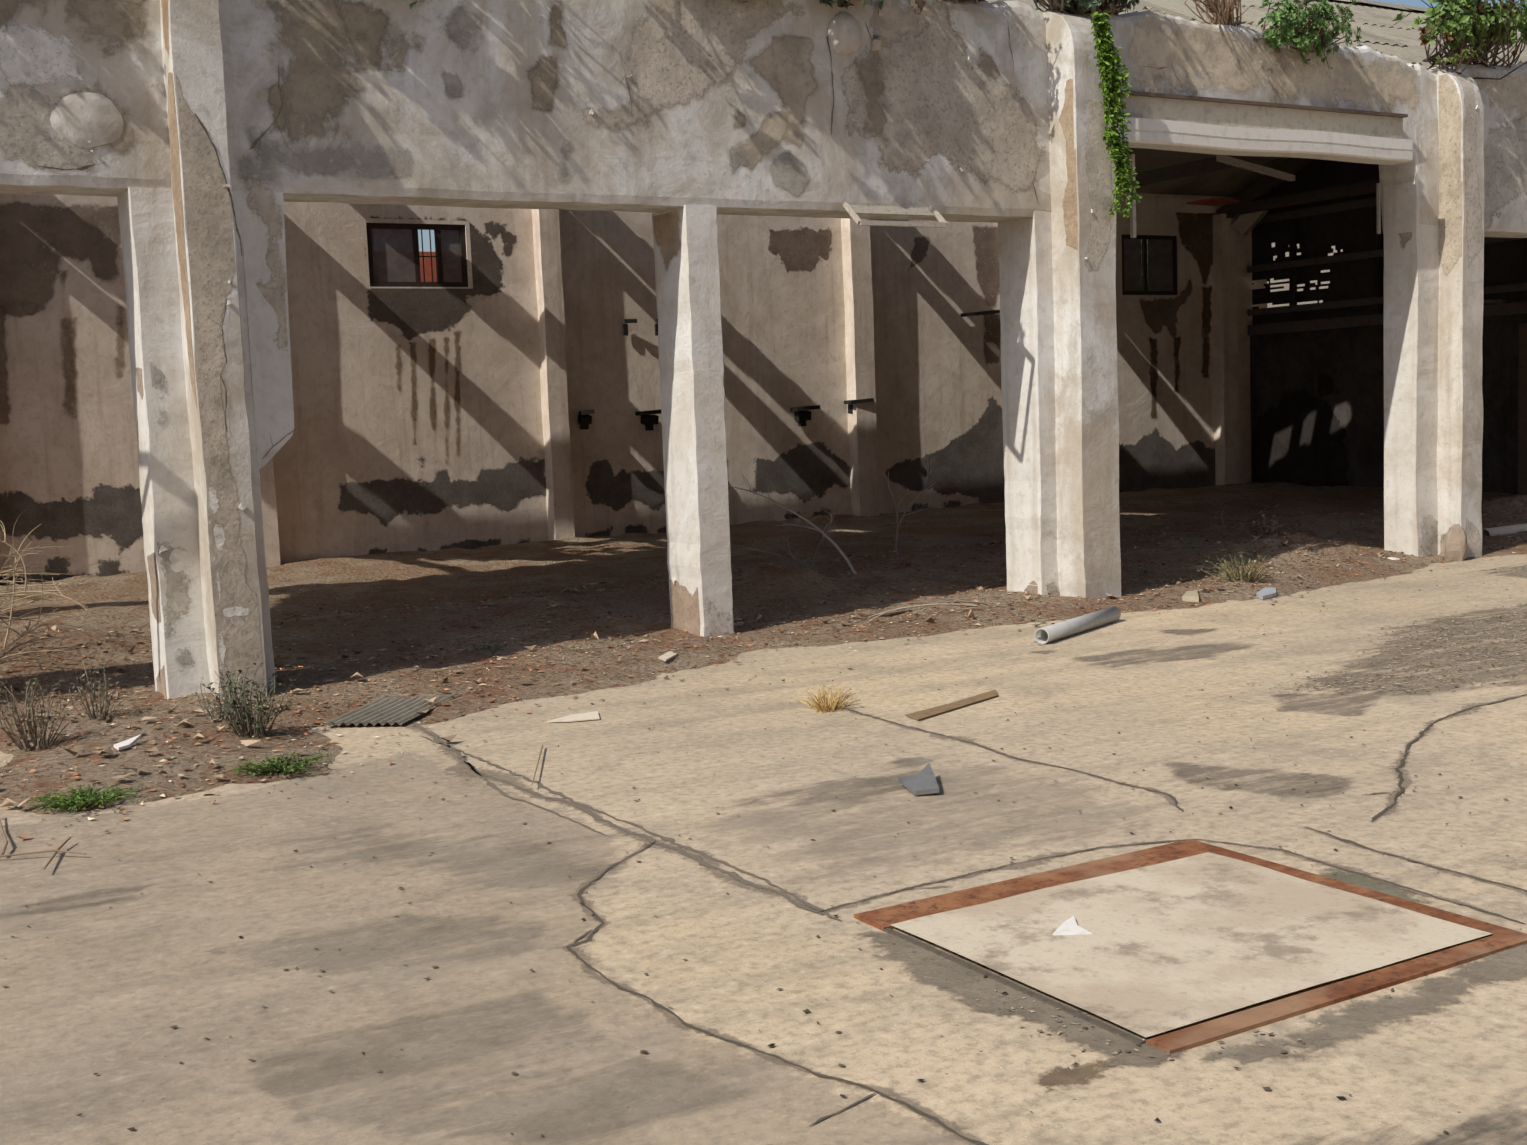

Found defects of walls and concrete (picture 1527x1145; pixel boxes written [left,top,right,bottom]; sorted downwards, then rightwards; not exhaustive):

peeling [0,20,96,172]
peeling [582,0,804,133]
peeling [841,0,1045,192]
peeling [1059,79,1078,250]
water stain [0,202,120,424]
water stain [0,483,191,638]
peeling [168,72,265,701]
water stain [338,331,546,527]
water stain [585,460,667,537]
water stain [752,442,851,520]
water stain [885,395,1005,511]
crack [405,694,1527,1145]